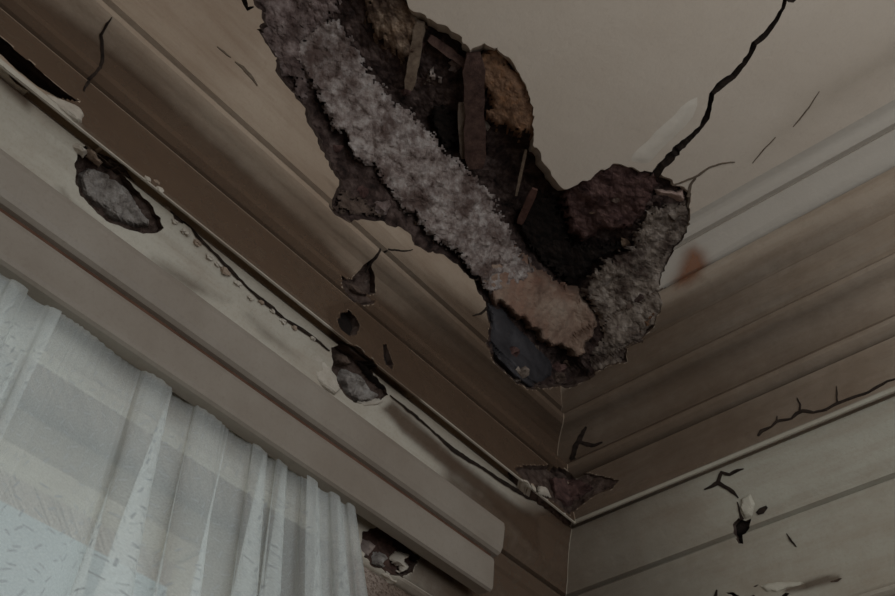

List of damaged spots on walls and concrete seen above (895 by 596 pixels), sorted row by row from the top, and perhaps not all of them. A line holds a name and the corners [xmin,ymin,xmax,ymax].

crack [649,0,820,197]
flaking render [72,143,164,234]
flaking render [256,0,689,388]
crack [170,210,330,351]
water stain [0,0,739,521]
flaking render [314,312,388,406]
crack [390,395,536,502]
water stain [385,404,571,596]
flaking render [508,468,617,525]
crack [704,468,768,520]
crack [757,378,895,436]
flaking render [360,528,420,584]